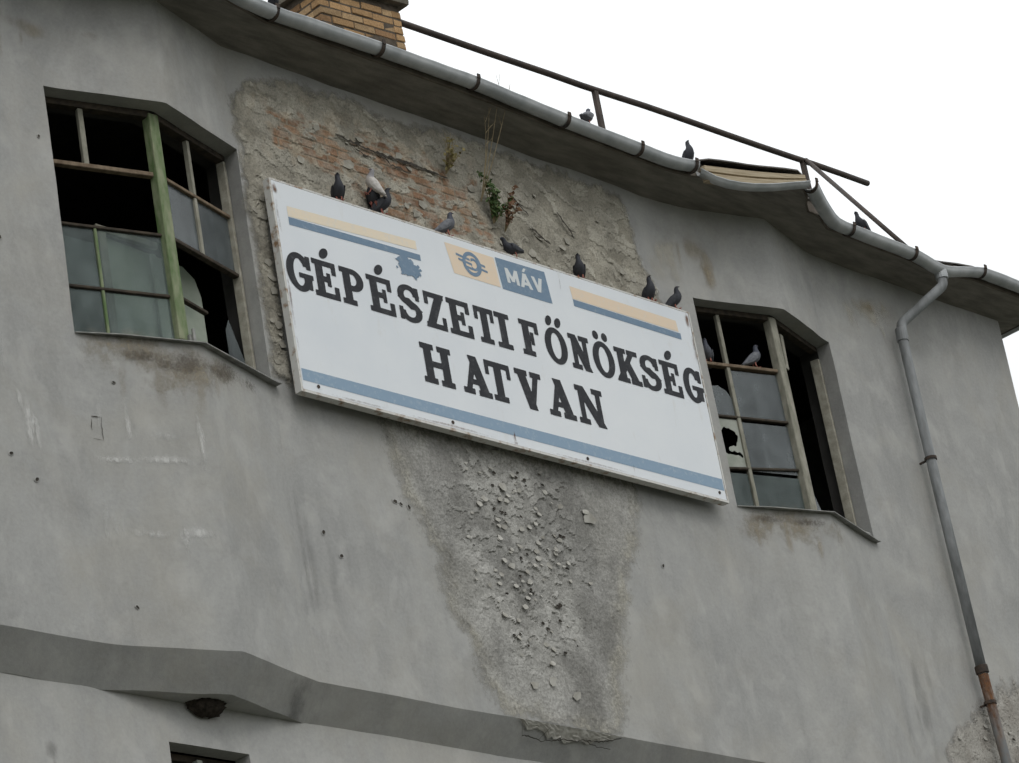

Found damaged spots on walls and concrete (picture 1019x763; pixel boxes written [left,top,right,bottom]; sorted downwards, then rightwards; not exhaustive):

peeling [232,79,660,384]
peeling [381,418,639,745]
crack [522,729,621,750]
flaking render [946,679,1019,763]